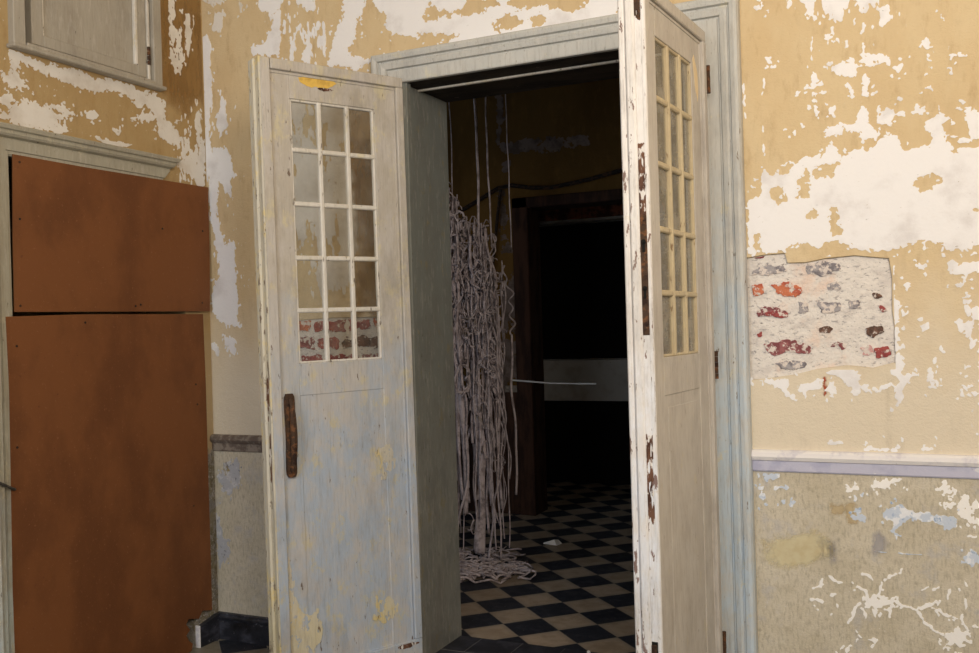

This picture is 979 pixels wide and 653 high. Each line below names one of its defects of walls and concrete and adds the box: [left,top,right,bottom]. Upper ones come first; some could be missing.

peeling [0,0,618,361]
peeling [745,0,979,412]
peeling [501,272,517,385]
peeling [216,457,242,569]
peeling [754,473,796,511]
peeling [845,478,979,567]
peeling [287,547,323,653]